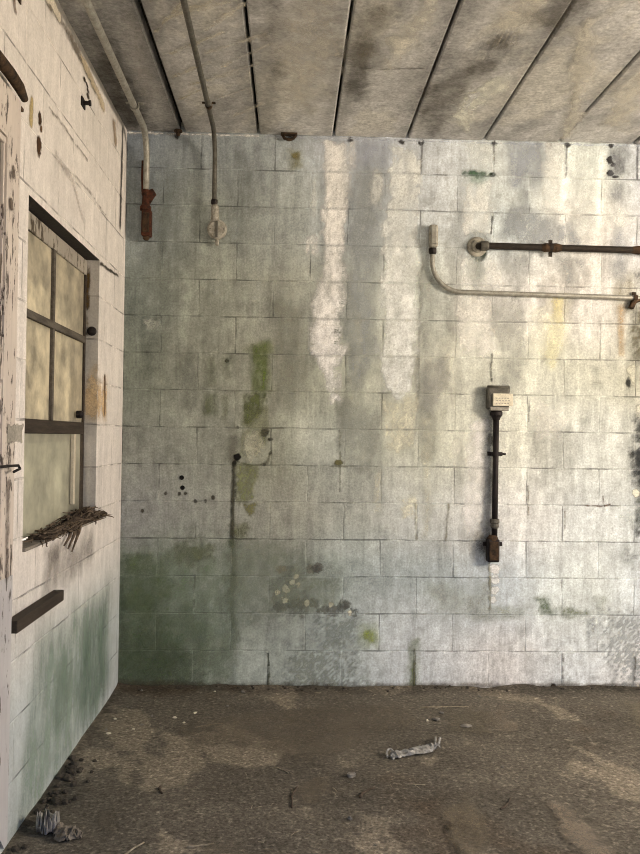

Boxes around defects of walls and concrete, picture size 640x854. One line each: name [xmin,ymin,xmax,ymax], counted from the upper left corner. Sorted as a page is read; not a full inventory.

peeling [46,0,105,111]
damp [453,65,506,130]
damp [310,137,450,451]
damp [630,309,640,356]
peeling [7,424,24,443]
damp [244,393,266,424]
damp [631,417,640,486]